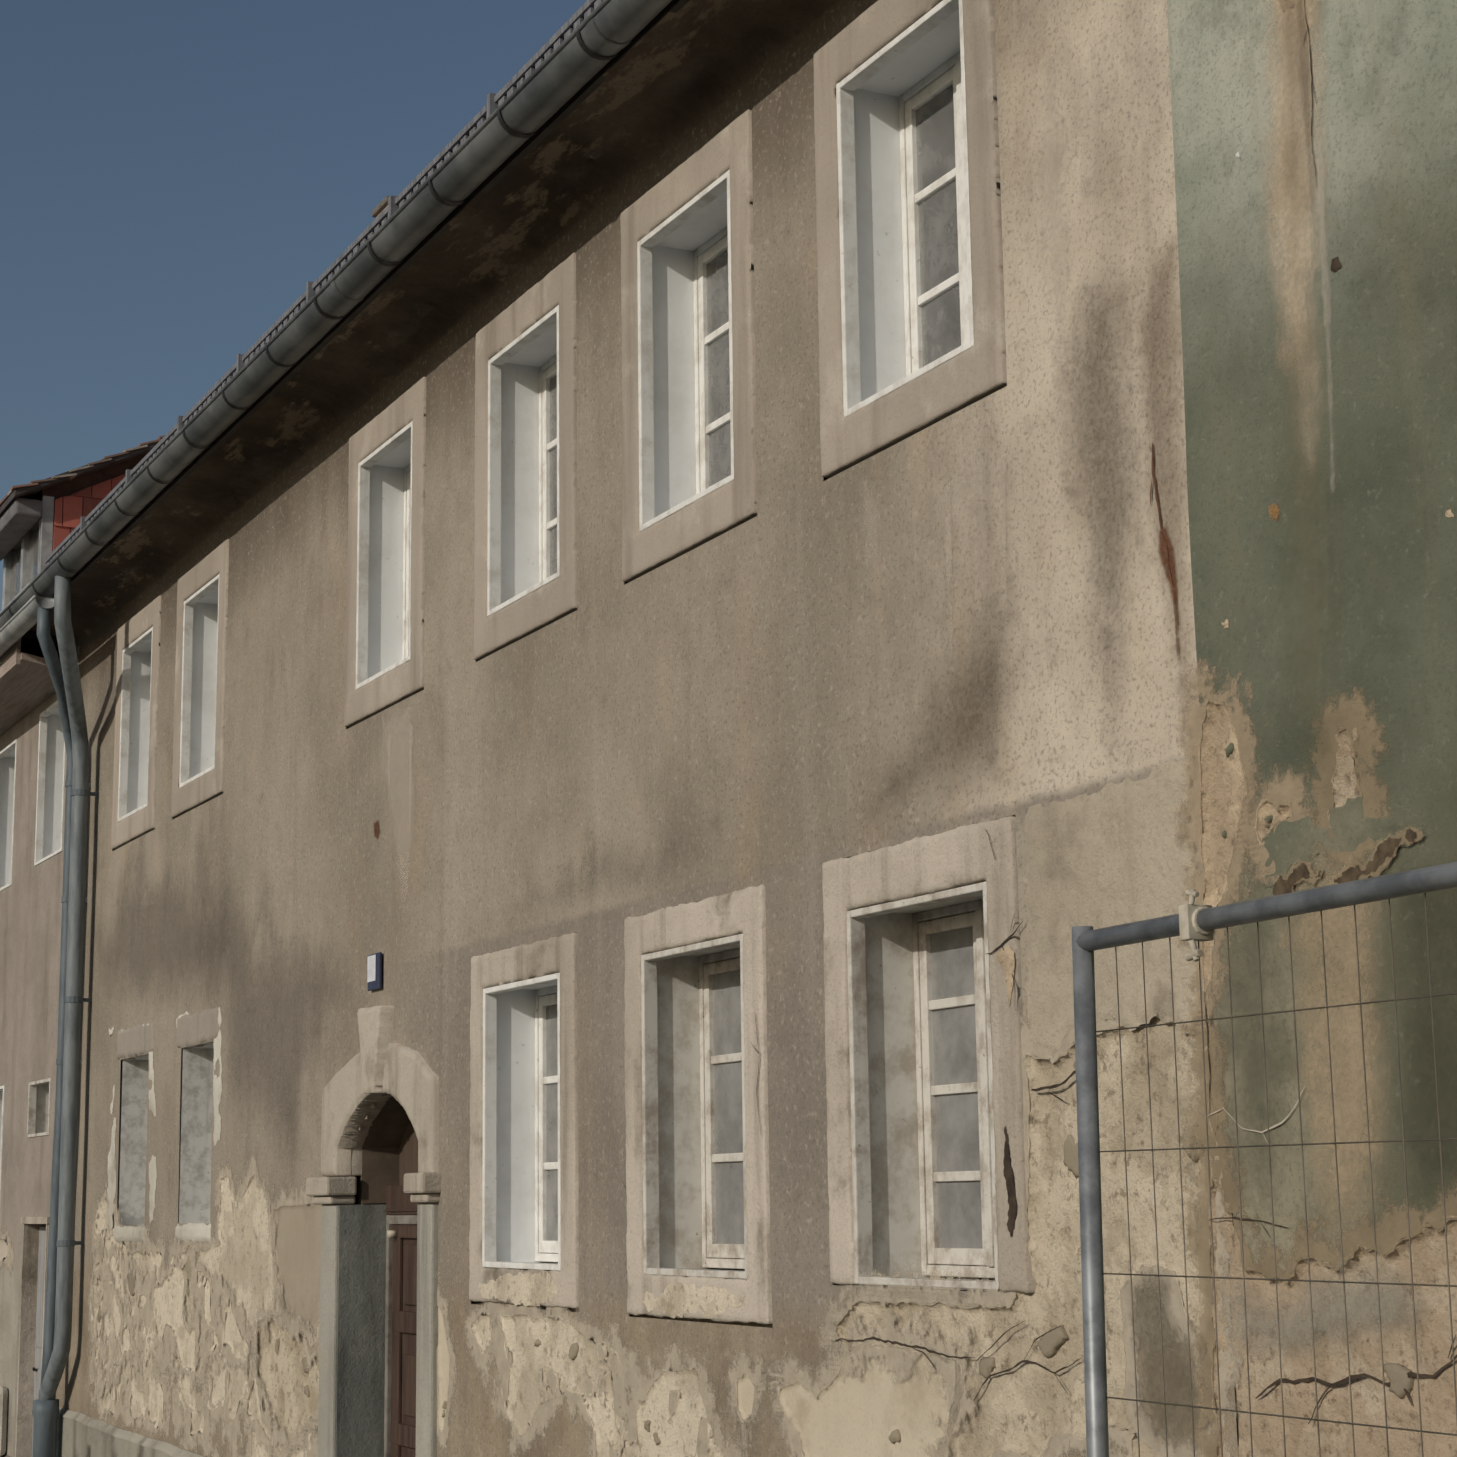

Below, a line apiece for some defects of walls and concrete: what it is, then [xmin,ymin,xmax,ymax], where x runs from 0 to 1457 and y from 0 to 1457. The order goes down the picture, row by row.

damp [1272,0,1317,379]
damp [1083,311,1124,559]
corrosion [1159,528,1180,653]
flaking render [1174,661,1390,907]
peeling [148,1052,156,1117]
flaking render [88,1085,324,1457]
peeling [213,1007,222,1146]
flaking render [437,945,1087,1457]
crack [835,1320,1081,1401]
flaking render [1096,928,1457,1457]
crack [1255,1335,1457,1424]